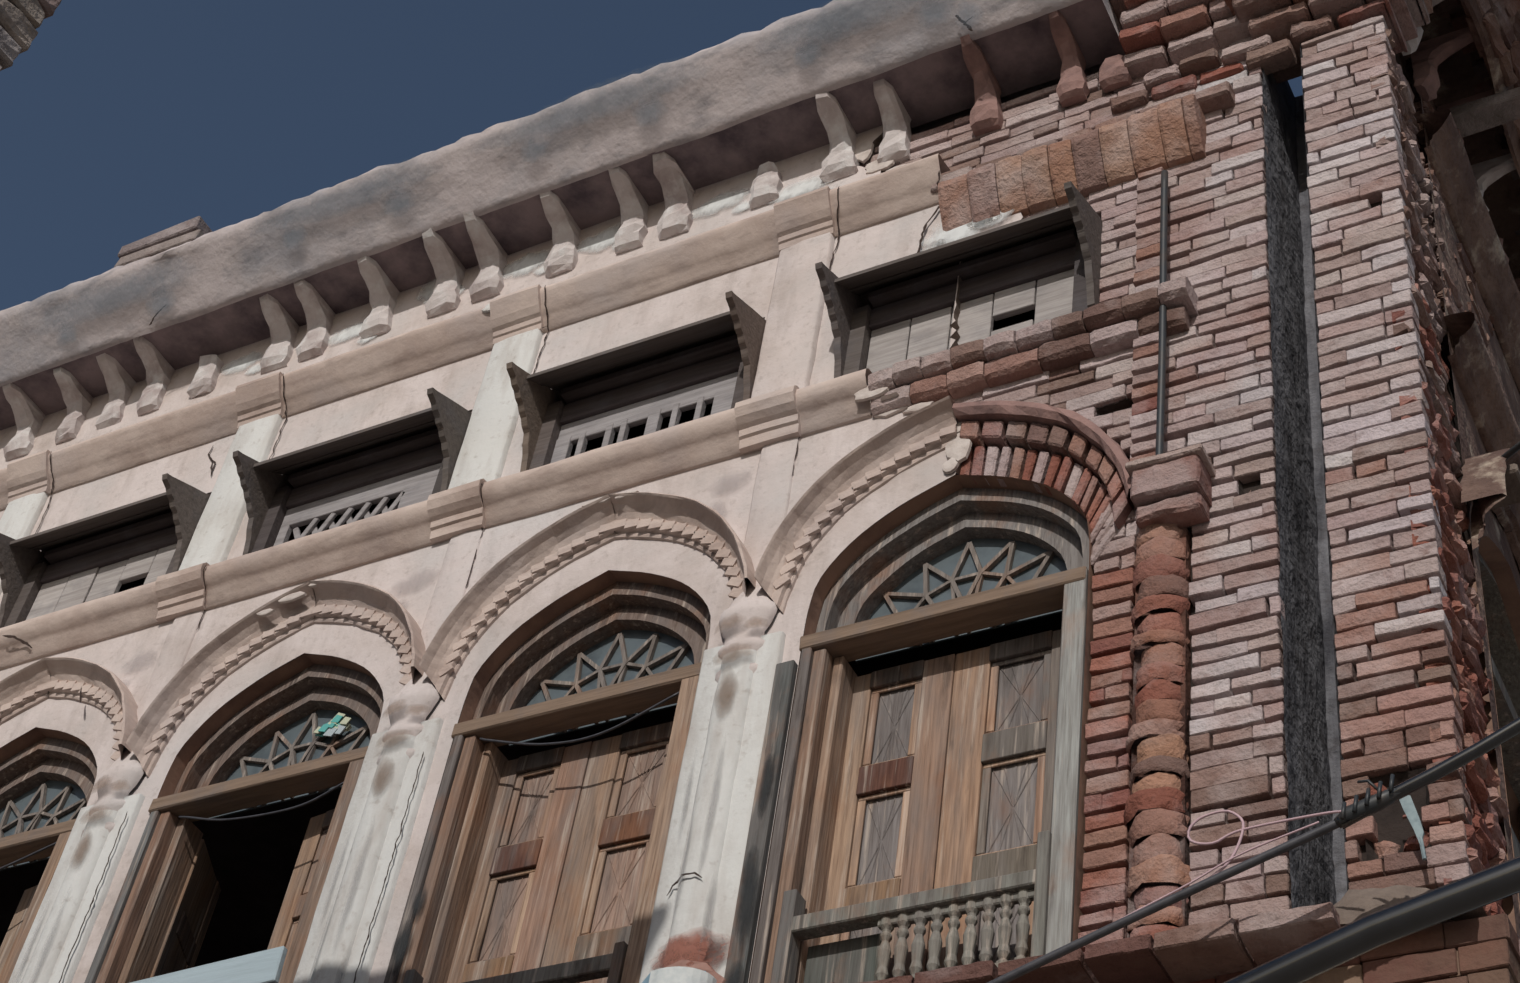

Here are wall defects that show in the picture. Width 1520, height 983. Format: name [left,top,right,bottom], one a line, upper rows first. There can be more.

crack [829,187,840,269]
leakage [420,279,436,301]
leakage [329,324,375,343]
leakage [223,353,261,374]
flaking render [854,37,1292,953]
spalling [1363,768,1430,816]
spalling [1365,825,1432,862]
spalling [666,960,726,983]